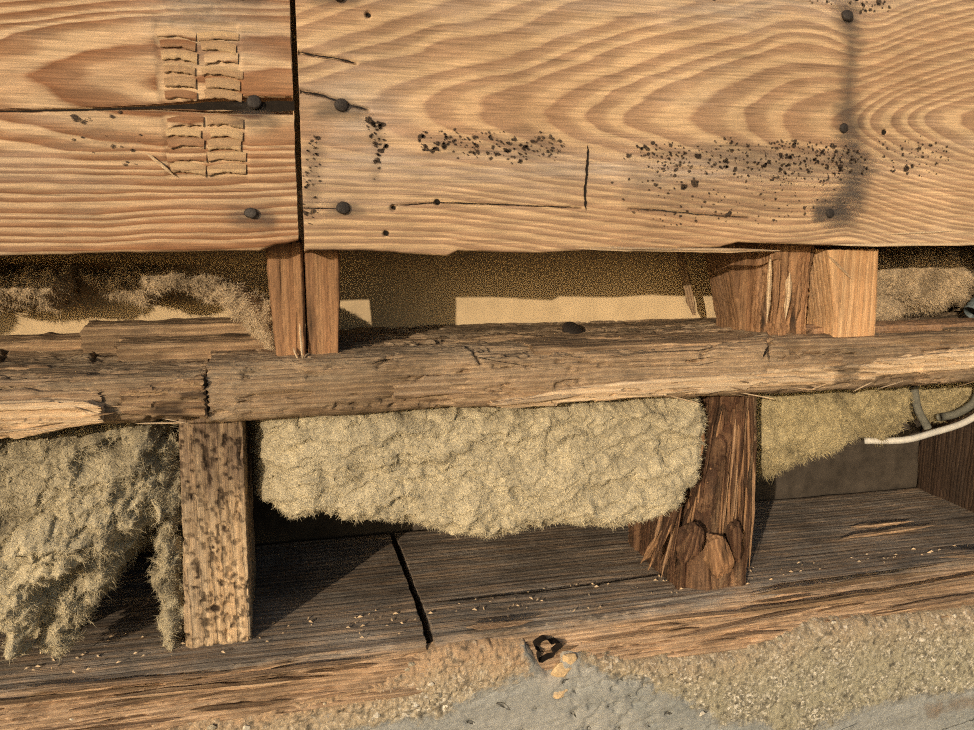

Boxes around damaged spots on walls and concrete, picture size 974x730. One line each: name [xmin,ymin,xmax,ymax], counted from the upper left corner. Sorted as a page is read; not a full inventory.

damp [842,0,891,42]
mould [365,116,389,180]
mould [418,129,564,163]
damp [623,101,868,225]
damp [878,136,948,176]
spalling [151,638,541,730]
spalling [576,604,974,730]